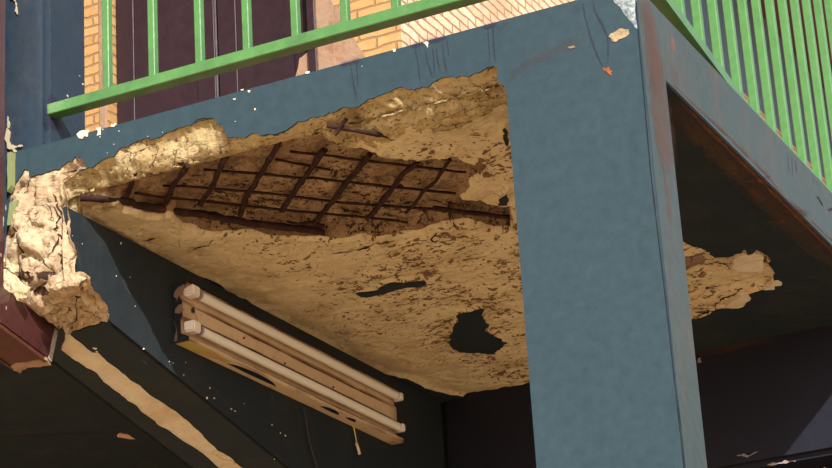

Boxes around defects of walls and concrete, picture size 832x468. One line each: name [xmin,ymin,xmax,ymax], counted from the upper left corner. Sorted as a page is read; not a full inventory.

spalling [0,67,530,468]
spalling [683,242,782,319]